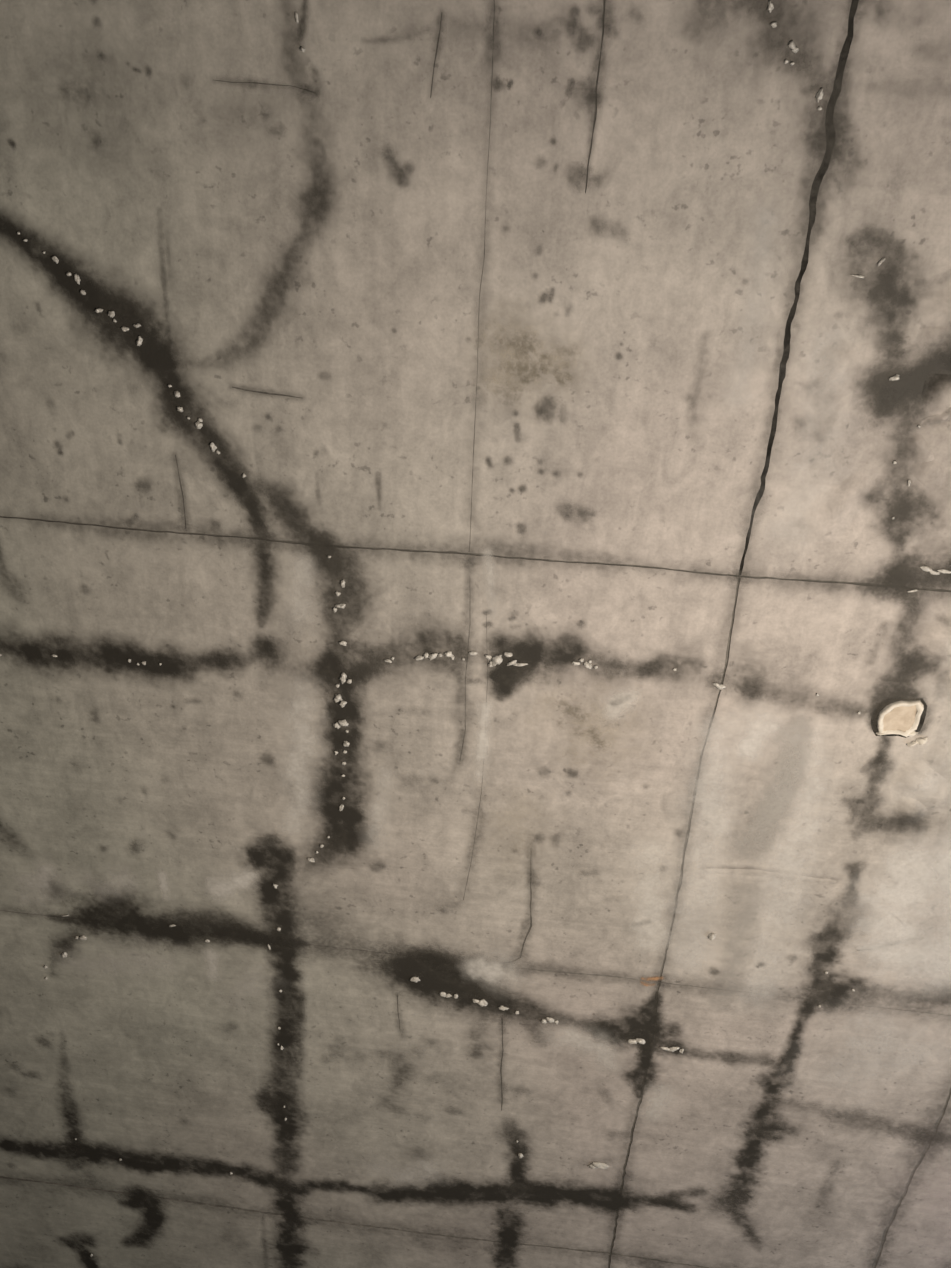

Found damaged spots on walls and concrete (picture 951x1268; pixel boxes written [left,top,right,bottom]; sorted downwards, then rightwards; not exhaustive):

crack [585,0,605,193]
leakage [246,165,329,351]
leakage [816,229,951,832]
leakage [0,213,704,1268]
leakage [713,678,775,700]
leakage [848,864,860,898]
leakage [719,921,876,1242]
leakage [909,986,951,1005]